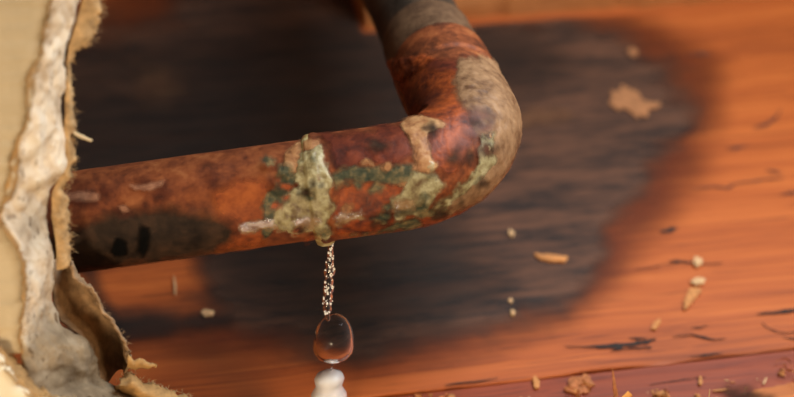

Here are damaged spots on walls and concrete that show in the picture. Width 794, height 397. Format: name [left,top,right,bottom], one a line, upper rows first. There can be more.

rust [386,54,474,174]
rust [334,183,405,236]
water stain [61,0,709,366]